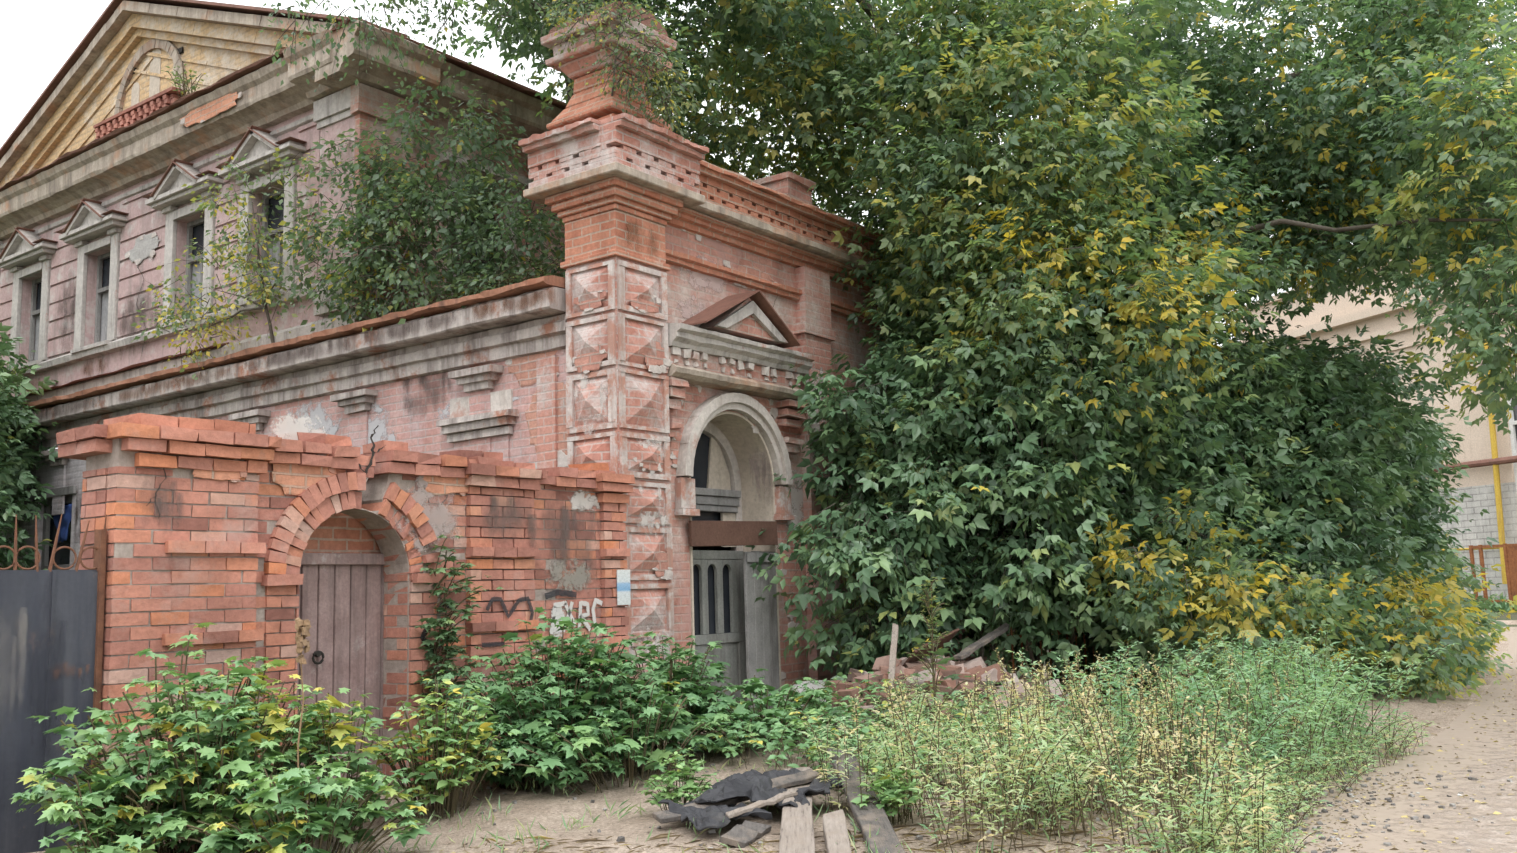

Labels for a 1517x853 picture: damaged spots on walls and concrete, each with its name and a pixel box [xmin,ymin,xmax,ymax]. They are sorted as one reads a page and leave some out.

peeling [310,426,337,435]
crack [359,425,386,474]
spalling [272,454,337,496]